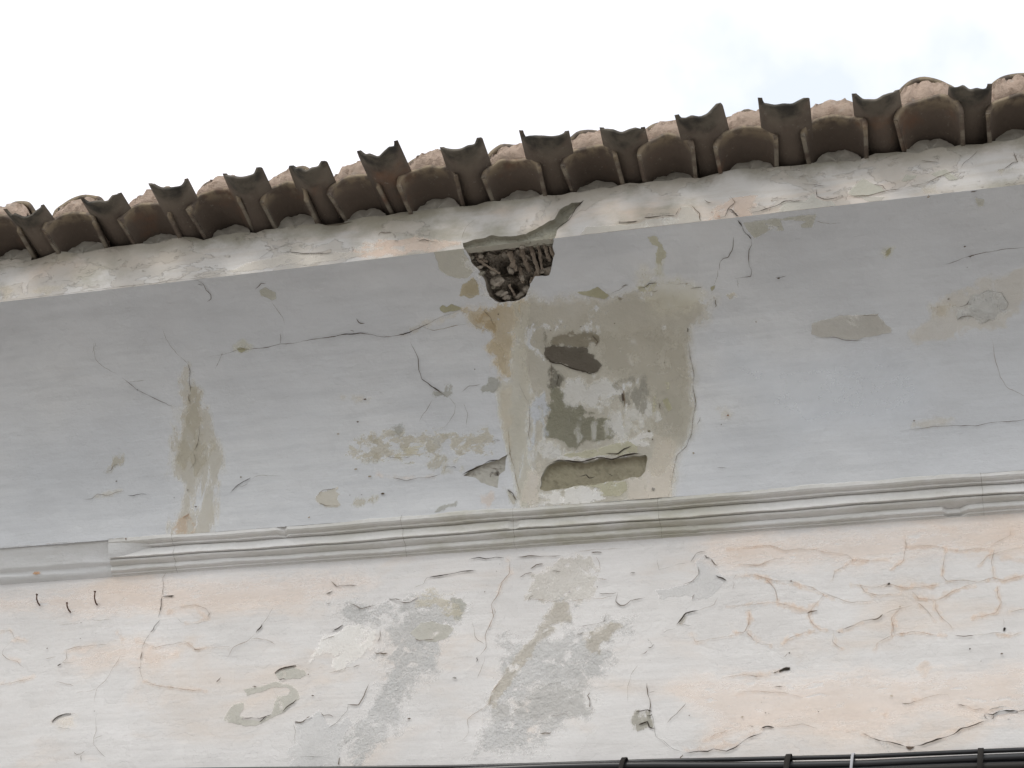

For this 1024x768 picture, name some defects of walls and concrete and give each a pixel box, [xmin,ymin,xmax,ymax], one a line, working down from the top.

water stain [167,365,222,535]
crack [217,312,468,423]
spalling [356,201,583,303]
spalling [346,326,673,504]
peeling [812,313,891,341]
crack [46,534,273,699]
peeling [224,588,462,767]
crack [323,513,616,679]
peeling [467,556,642,758]
crack [661,686,819,758]
crack [627,531,1022,700]
crack [865,694,1024,750]